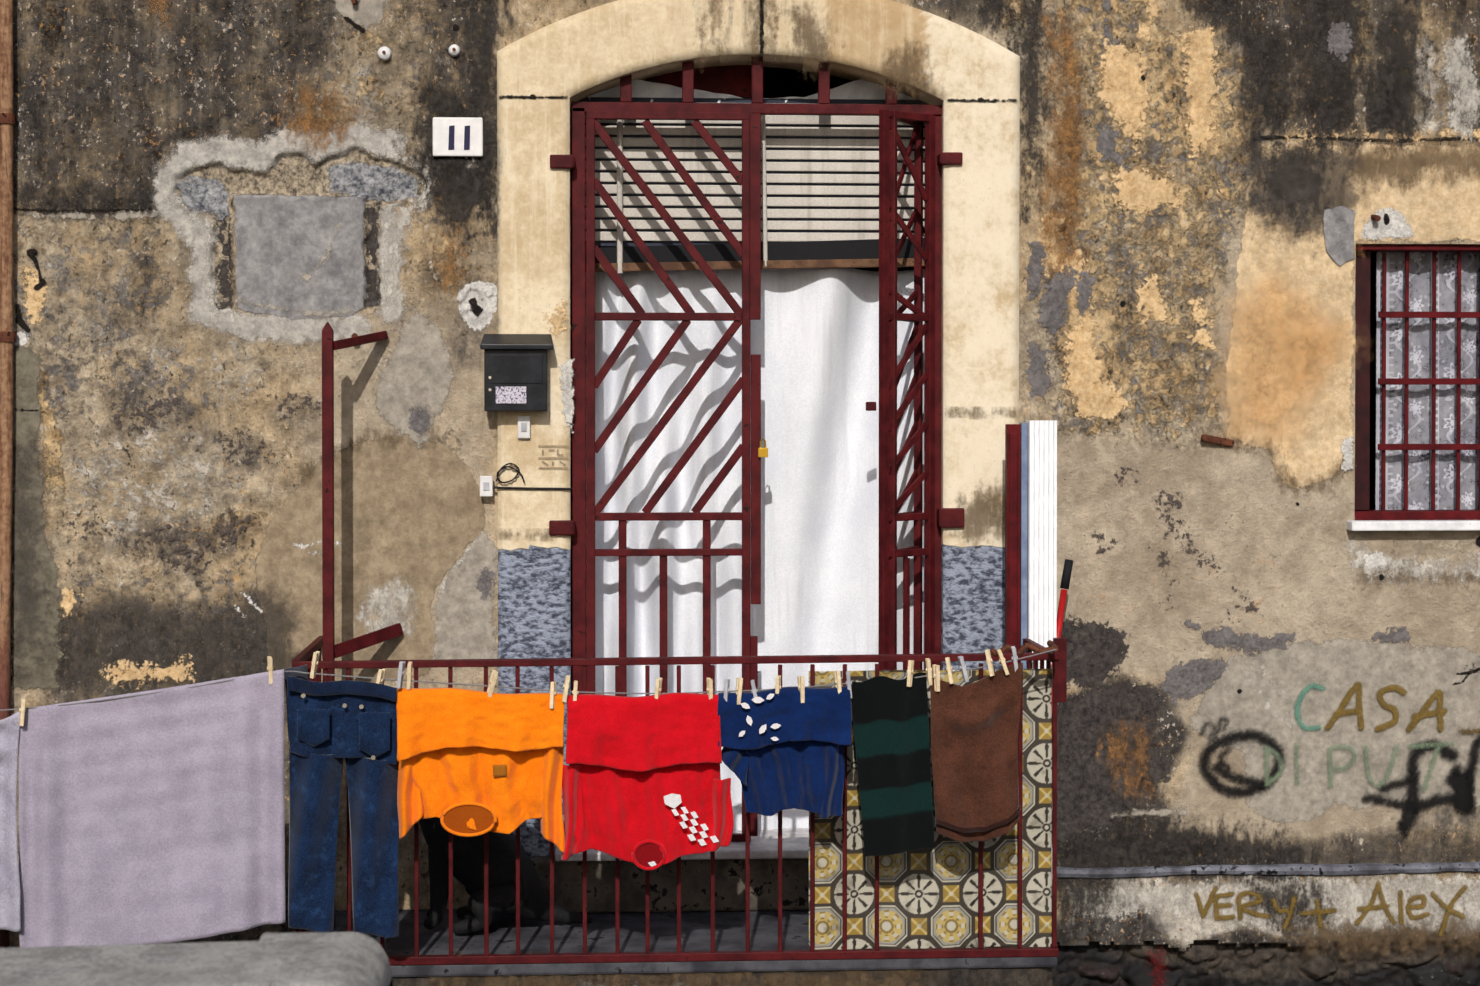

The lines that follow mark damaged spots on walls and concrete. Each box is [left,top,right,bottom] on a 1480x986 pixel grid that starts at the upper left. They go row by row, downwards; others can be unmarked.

damp [14,181,161,228]
spalling [170,142,433,322]
peeling [1024,208,1131,422]
peeling [1092,0,1188,218]
peeling [1135,274,1169,330]
peeling [1179,26,1223,159]
damp [1181,0,1480,234]
peeling [1187,141,1480,492]
spalling [1371,626,1411,646]